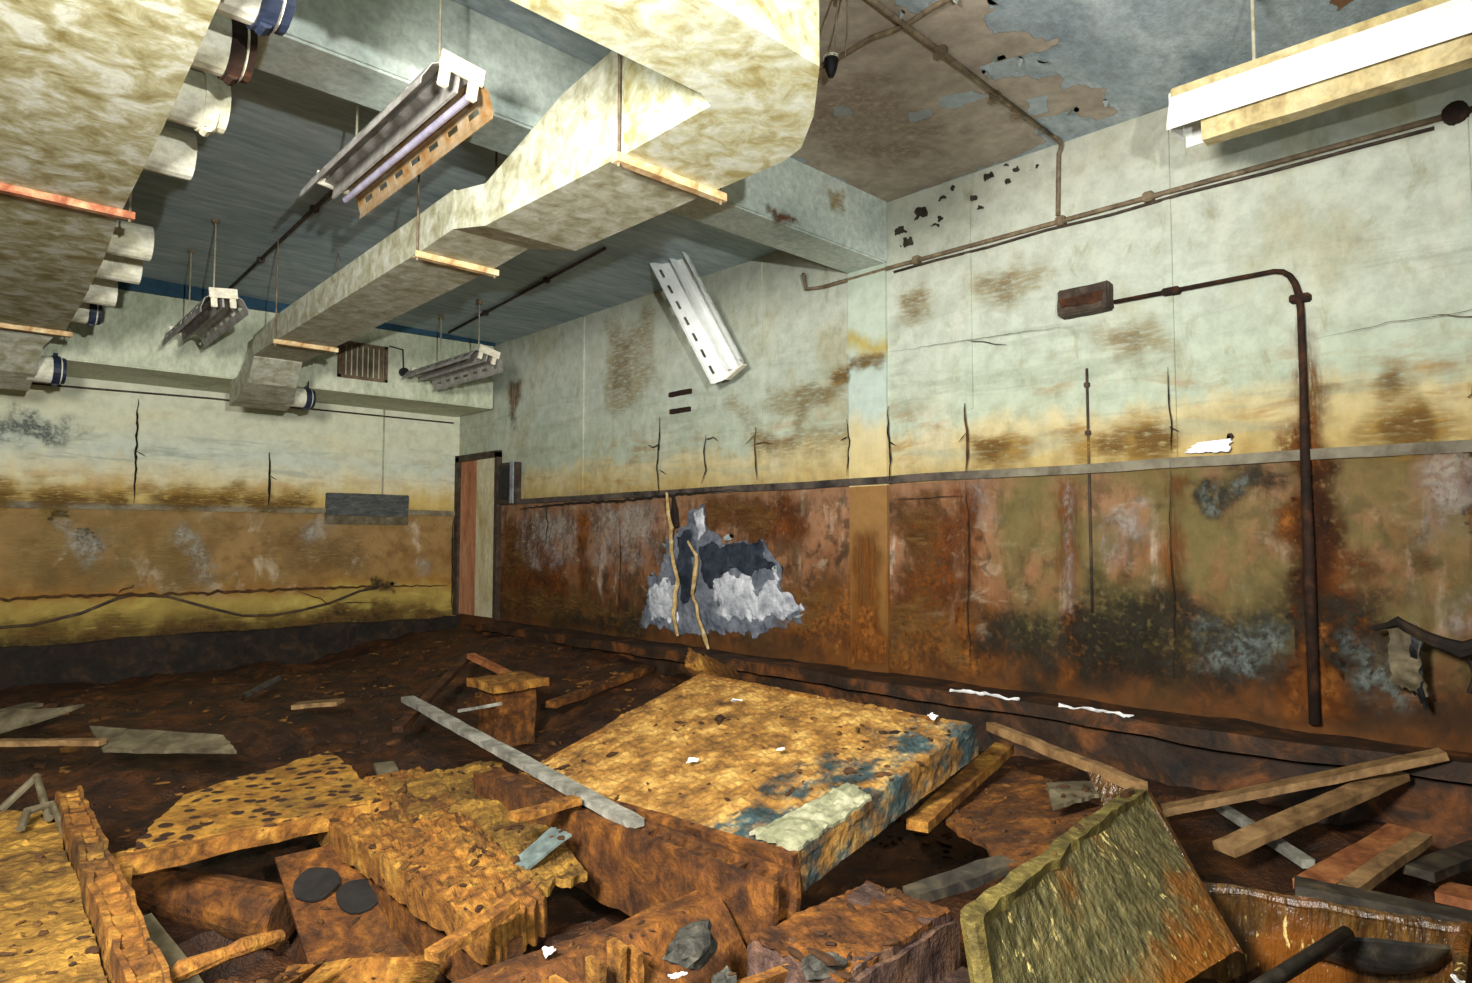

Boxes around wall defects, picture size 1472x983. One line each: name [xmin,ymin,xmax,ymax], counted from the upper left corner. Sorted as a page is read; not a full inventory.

peeling [791,0,1118,248]
leakage [974,437,1024,461]
leakage [1074,420,1174,460]
leakage [1360,374,1450,458]
leakage [157,482,311,511]
flaking render [639,492,807,649]
corrosion [708,494,809,544]
corrosion [1278,360,1374,717]
corrosion [790,586,850,655]
corrosion [889,598,987,675]
leakage [949,589,1404,702]
leakage [1058,703,1134,718]